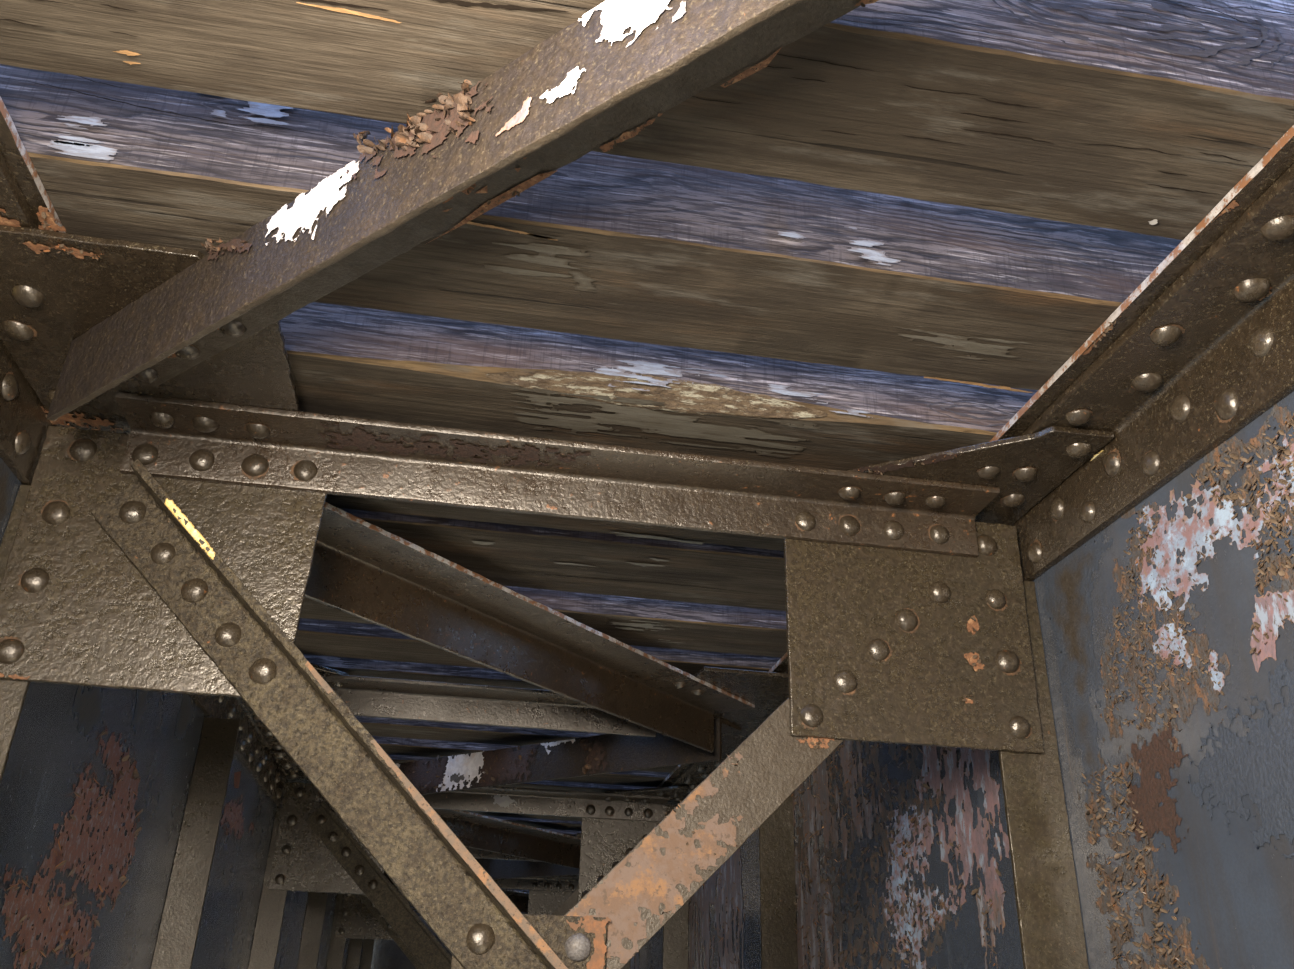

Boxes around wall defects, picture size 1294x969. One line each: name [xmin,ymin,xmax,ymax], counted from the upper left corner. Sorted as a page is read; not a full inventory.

crack [1,0,138,37]
crack [301,0,389,11]
crack [436,0,568,12]
peeling [578,0,686,47]
peeling [496,67,585,136]
peeling [265,80,476,246]
rust [305,661,333,694]
peeling [1077,403,1294,969]
peeling [404,751,522,792]
rust [370,740,568,969]
rust [564,751,754,969]
peeling [791,737,1010,969]